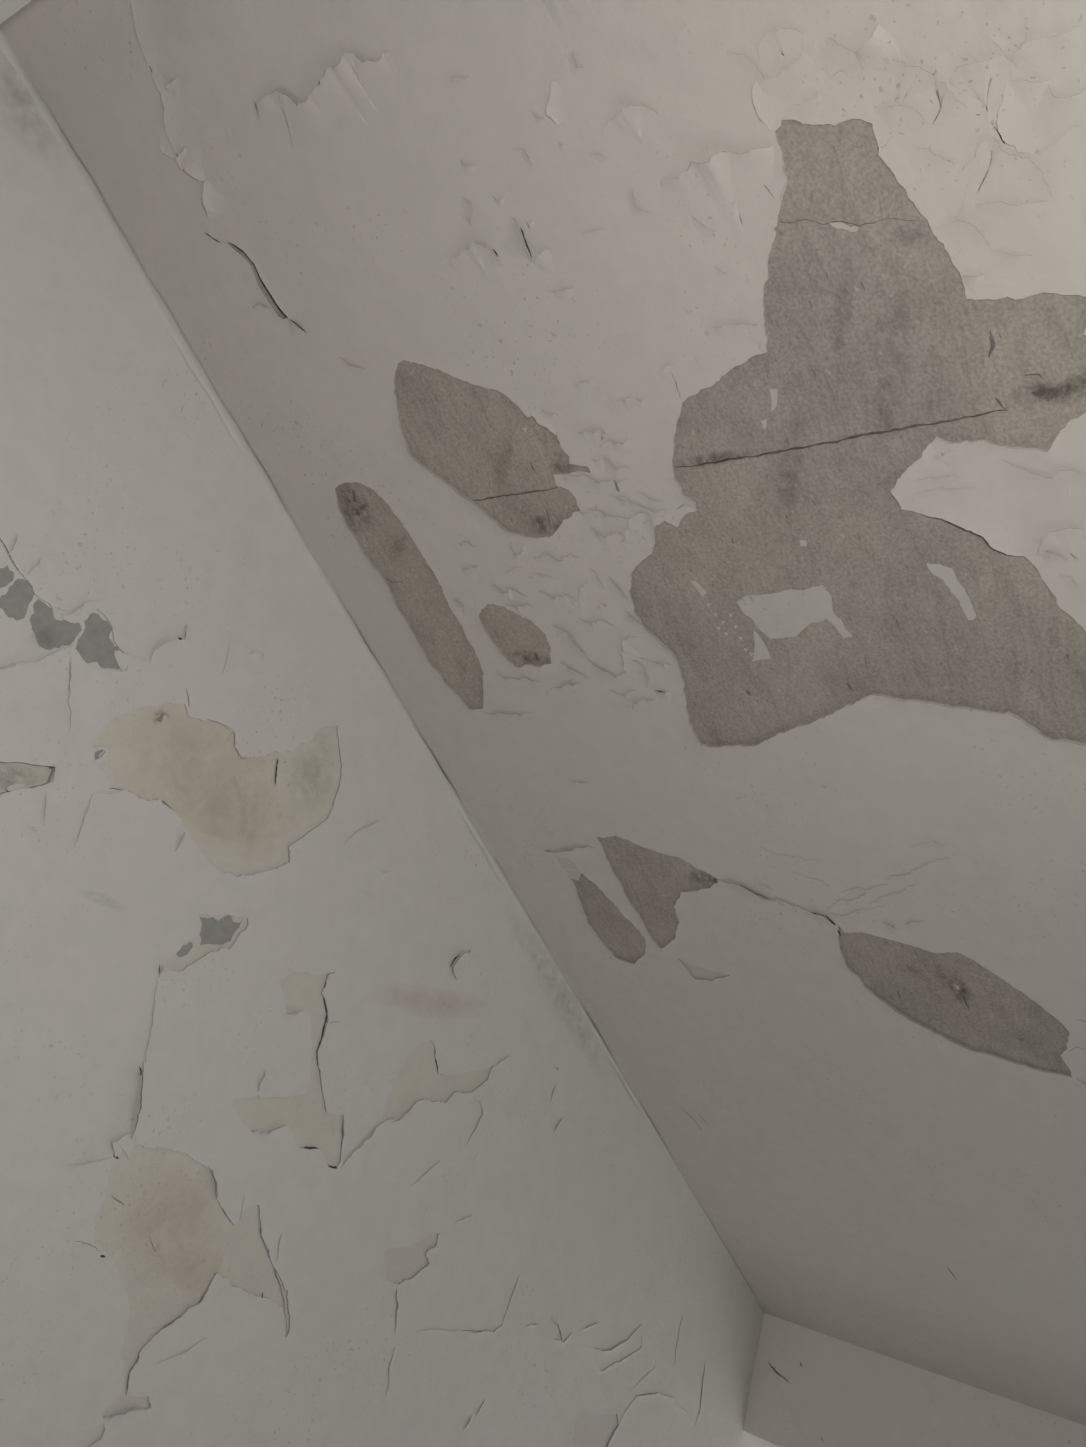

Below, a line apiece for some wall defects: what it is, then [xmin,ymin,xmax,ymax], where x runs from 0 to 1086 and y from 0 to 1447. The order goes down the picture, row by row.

peeling [383,349,604,553]
peeling [615,98,1086,767]
peeling [327,475,558,718]
peeling [0,523,348,890]
peeling [159,908,254,981]
peeling [227,965,350,1177]
peeling [379,1034,510,1147]
peeling [556,830,732,983]
peeling [828,918,1083,1085]
peeling [78,1132,297,1430]